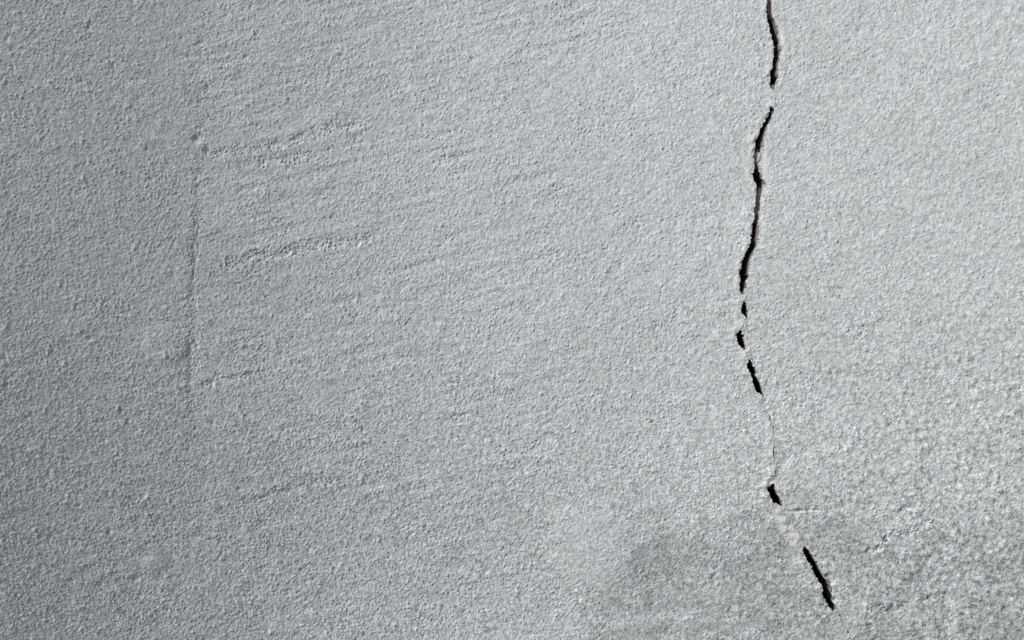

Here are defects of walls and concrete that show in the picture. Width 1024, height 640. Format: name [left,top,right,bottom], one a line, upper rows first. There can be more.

crack [736,0,851,639]